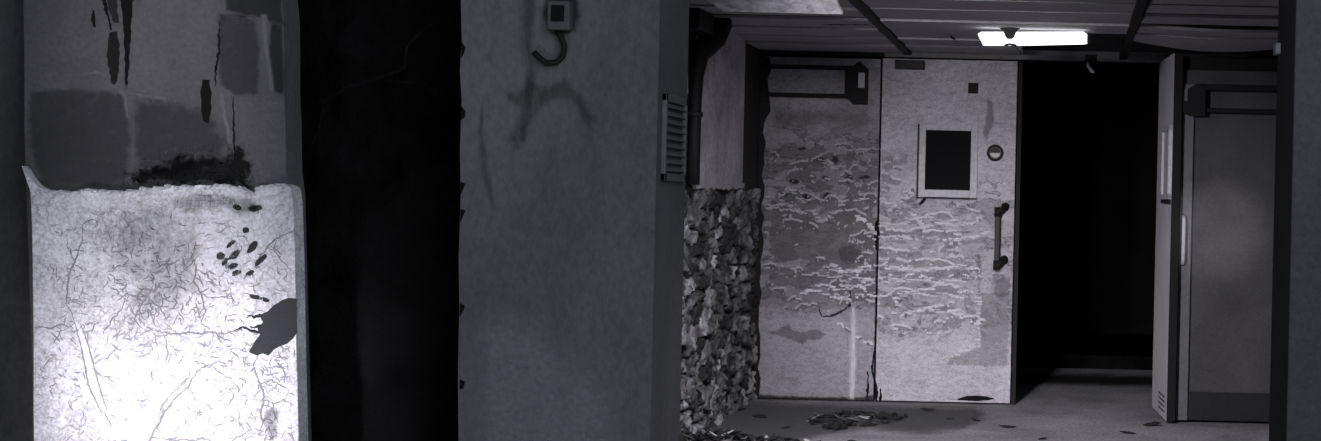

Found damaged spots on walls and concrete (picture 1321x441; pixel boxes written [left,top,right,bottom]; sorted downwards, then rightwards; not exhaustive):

crack [91,0,133,86]
crack [35,209,295,441]
peeling [762,142,992,361]